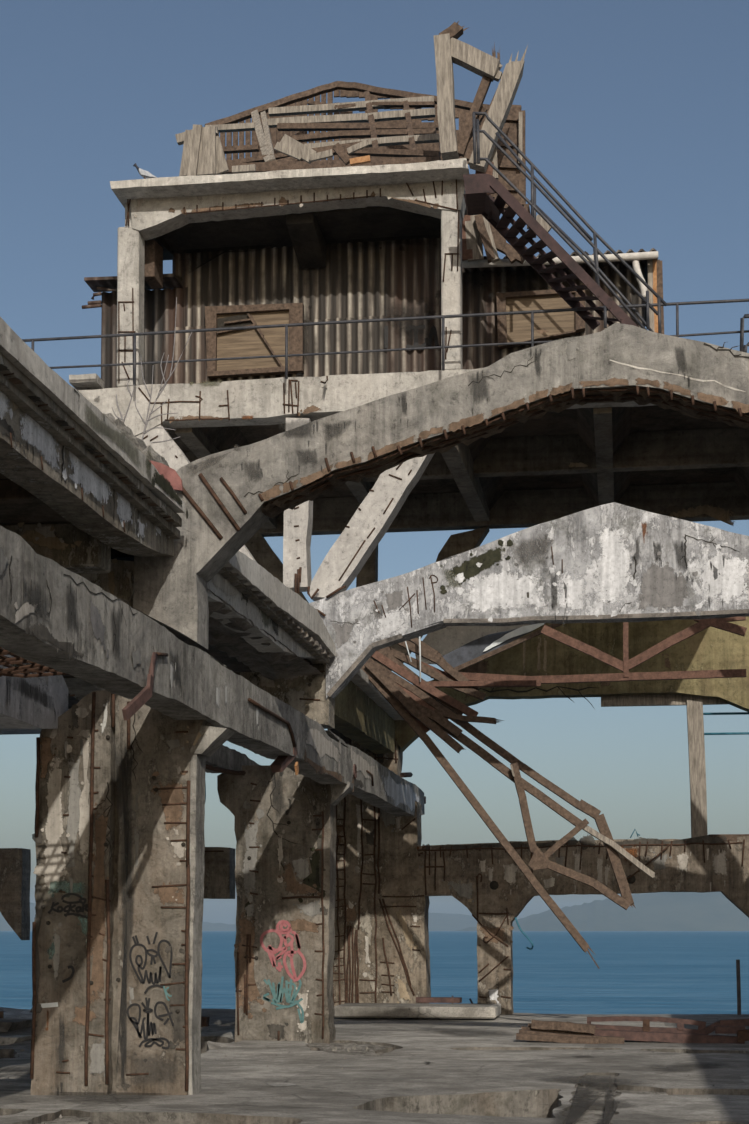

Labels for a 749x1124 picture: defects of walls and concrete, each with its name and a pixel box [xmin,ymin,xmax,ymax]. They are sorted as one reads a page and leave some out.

spalling [118,288,230,441]
flaking render [0,364,223,540]
spalling [194,464,247,532]
spalling [665,504,736,526]
spalling [14,602,87,659]
spalling [208,573,326,701]
flaking render [294,527,375,656]
flaking render [372,524,749,641]
spalling [206,764,257,786]
spalling [30,692,131,1086]
spalling [151,765,191,1091]